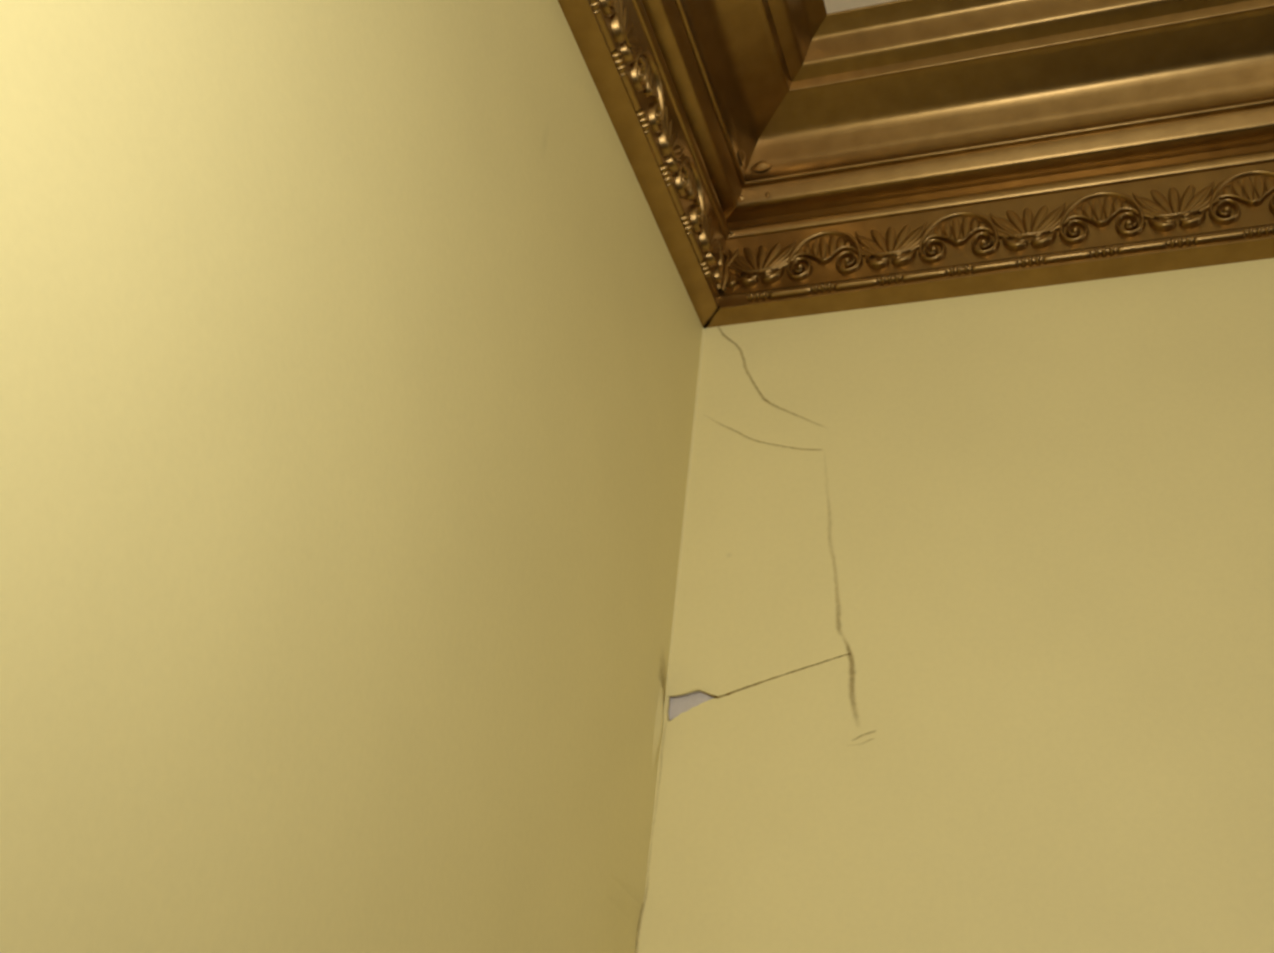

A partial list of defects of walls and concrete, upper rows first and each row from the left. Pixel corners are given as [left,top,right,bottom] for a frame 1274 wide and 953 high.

crack [715,654,851,698]
flaking render [668,687,717,721]